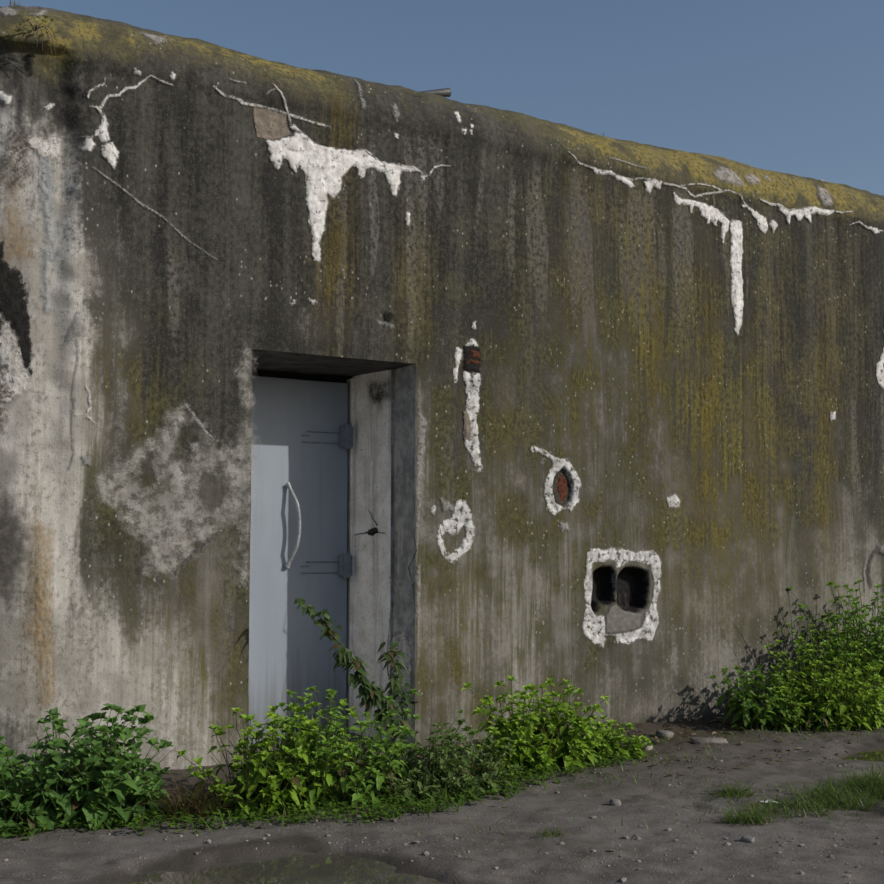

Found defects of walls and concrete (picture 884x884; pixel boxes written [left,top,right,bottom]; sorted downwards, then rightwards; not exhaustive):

crack [88,69,176,117]
water stain [82,116,119,167]
crack [93,167,200,248]
water stain [267,125,425,261]
crack [570,152,805,210]
water stain [779,206,833,223]
crack [830,210,883,231]
water stain [674,192,744,334]
spalling [453,339,483,472]
spalling [531,446,582,532]
spalling [432,498,476,563]
spalling [583,547,661,647]